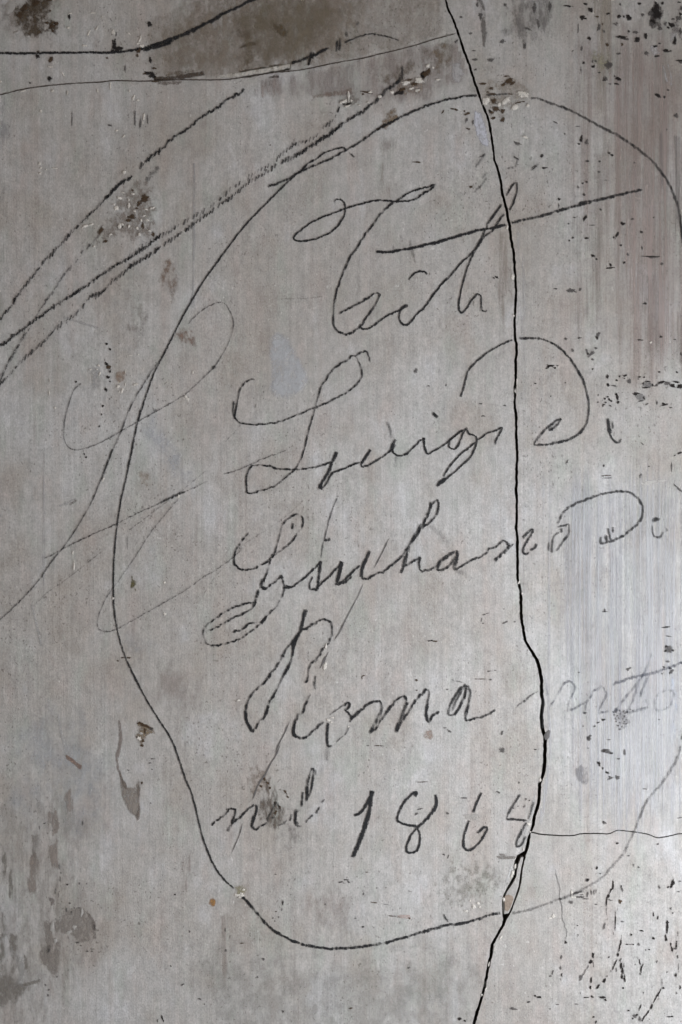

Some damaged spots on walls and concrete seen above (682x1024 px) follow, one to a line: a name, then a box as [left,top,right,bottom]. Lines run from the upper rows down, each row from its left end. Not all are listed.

crack [445,0,682,1024]